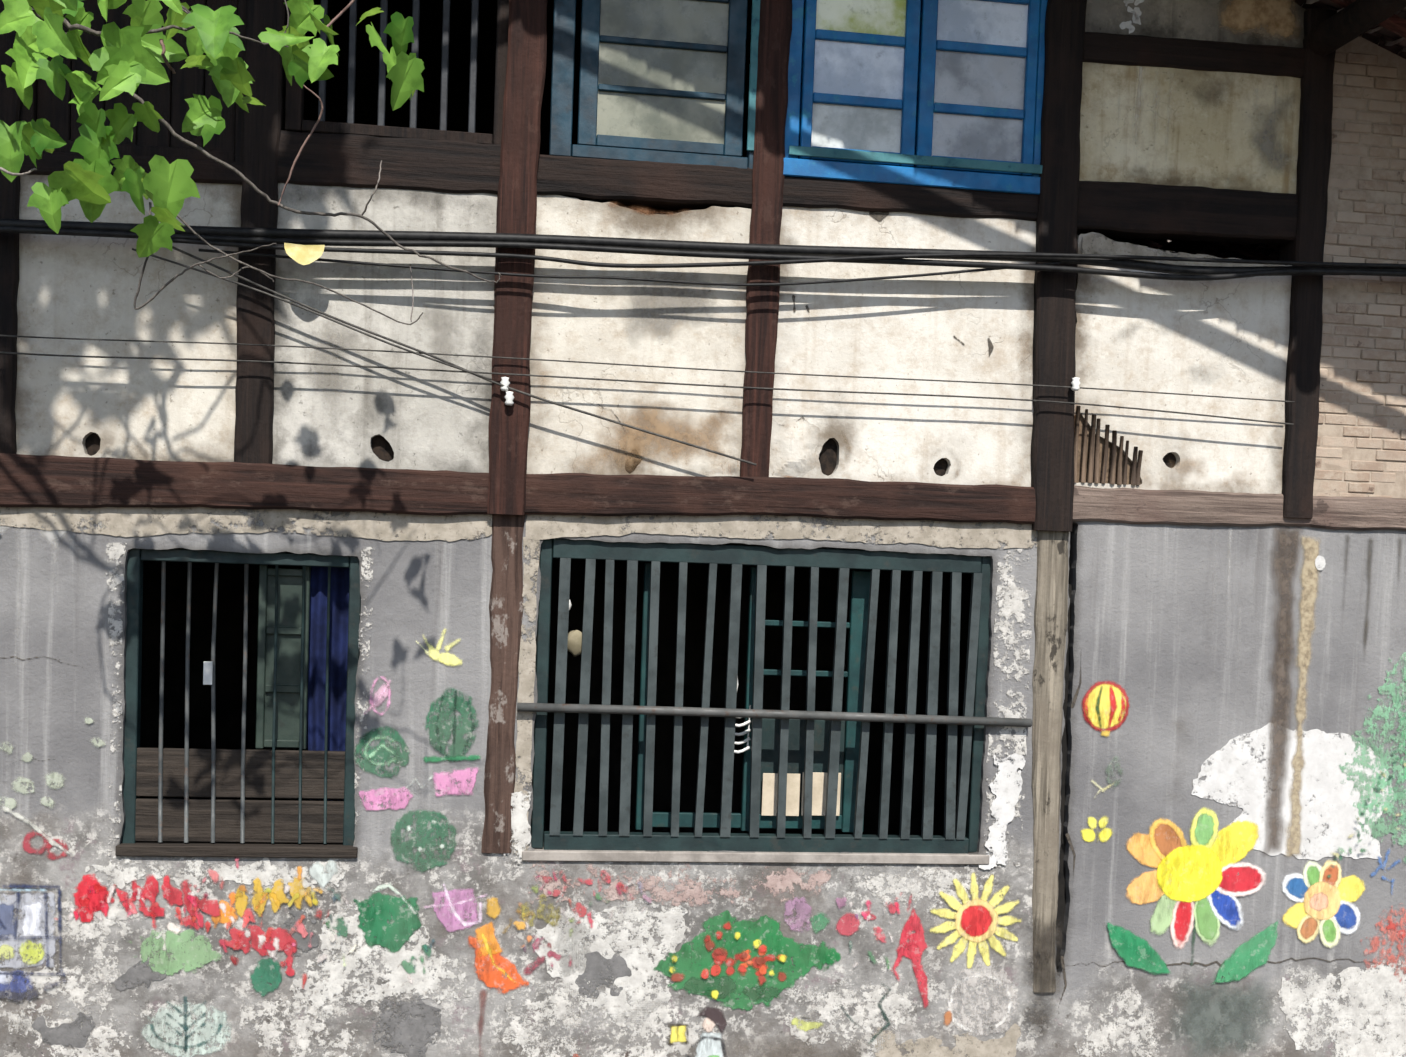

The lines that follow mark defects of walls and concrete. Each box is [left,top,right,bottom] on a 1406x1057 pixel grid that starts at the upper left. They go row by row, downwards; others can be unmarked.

flaking render [1081,233,1286,267]
peeling [502,791,831,1057]
peeling [1191,723,1394,861]
water stain [1268,531,1319,856]